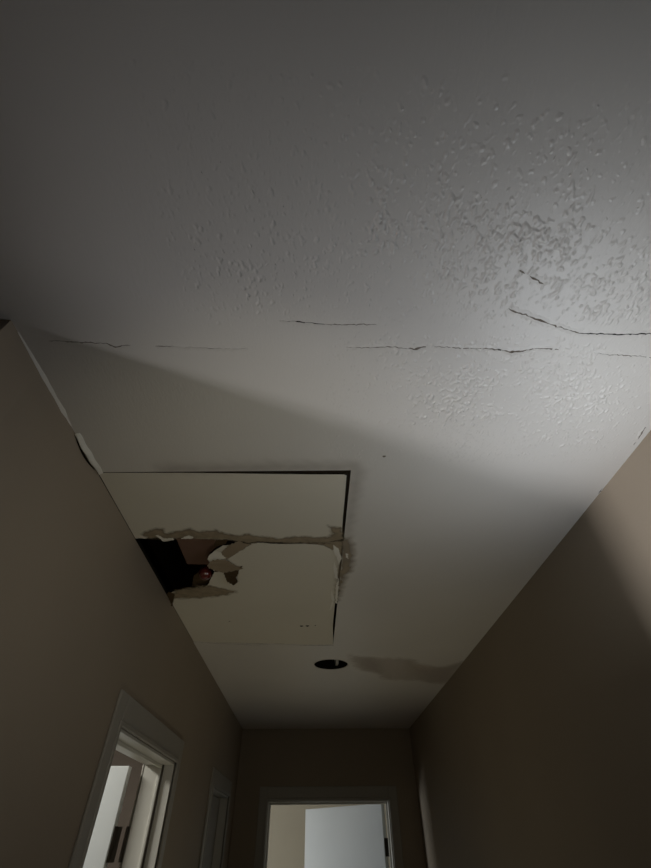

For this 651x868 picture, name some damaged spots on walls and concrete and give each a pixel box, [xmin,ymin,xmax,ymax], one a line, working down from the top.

crack [279,307,651,360]
peeling [224,566,242,585]